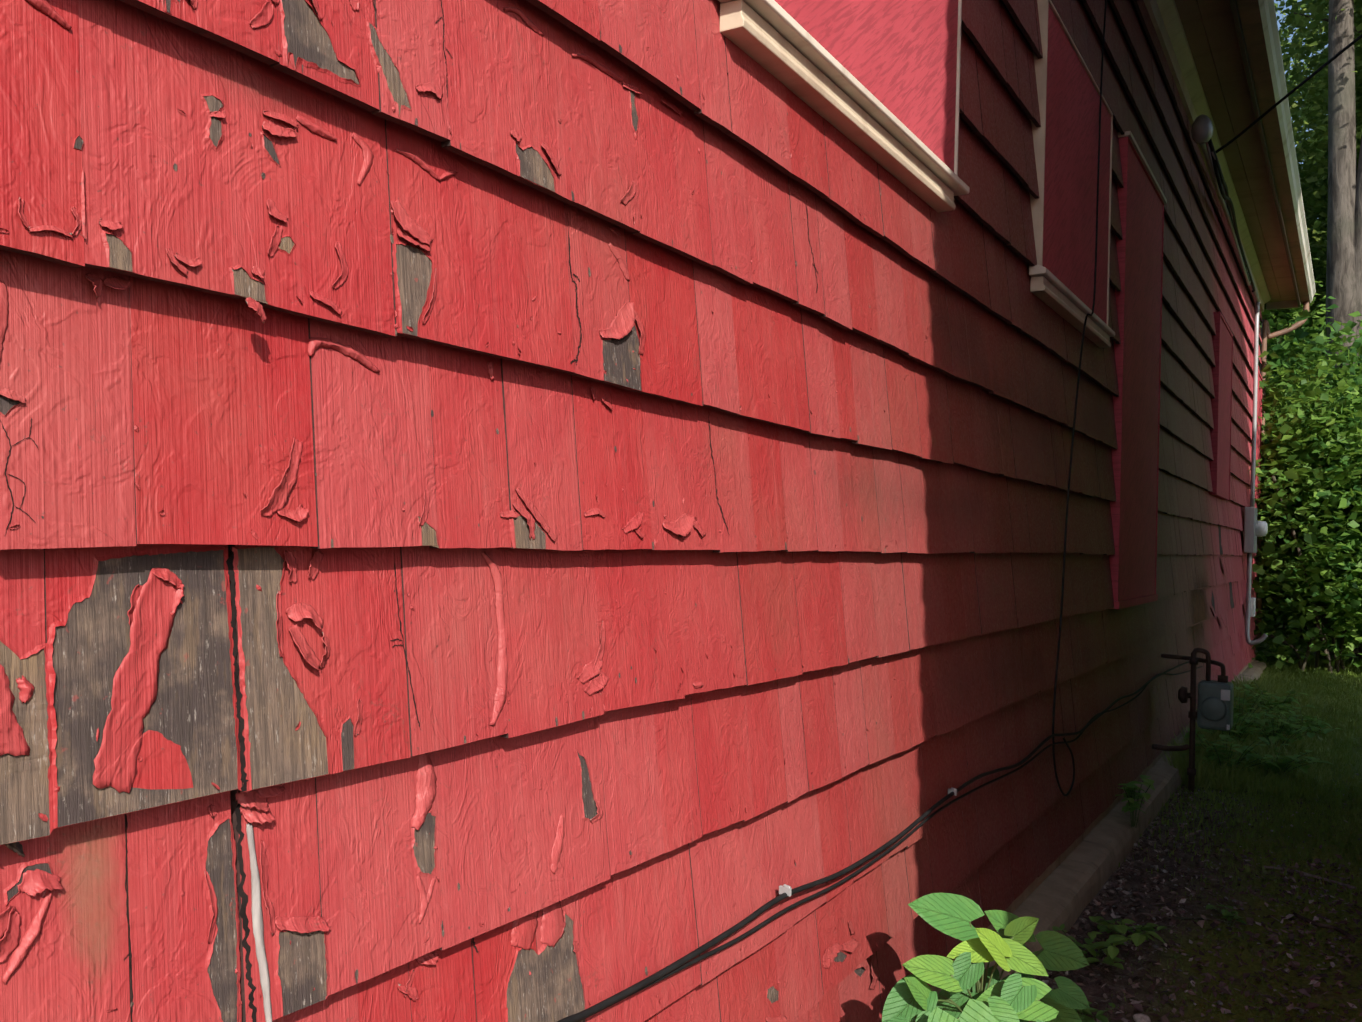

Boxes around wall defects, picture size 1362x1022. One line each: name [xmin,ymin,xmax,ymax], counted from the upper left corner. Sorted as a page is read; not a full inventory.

peeling [249,0,361,87]
peeling [350,0,443,118]
peeling [260,110,374,185]
peeling [511,130,562,194]
peeling [18,167,134,298]
peeling [229,198,296,323]
peeling [391,200,437,337]
peeling [590,300,646,411]
crack [0,418,38,535]
peeling [0,547,363,1022]
peeling [411,753,437,924]
peeling [503,893,586,1022]